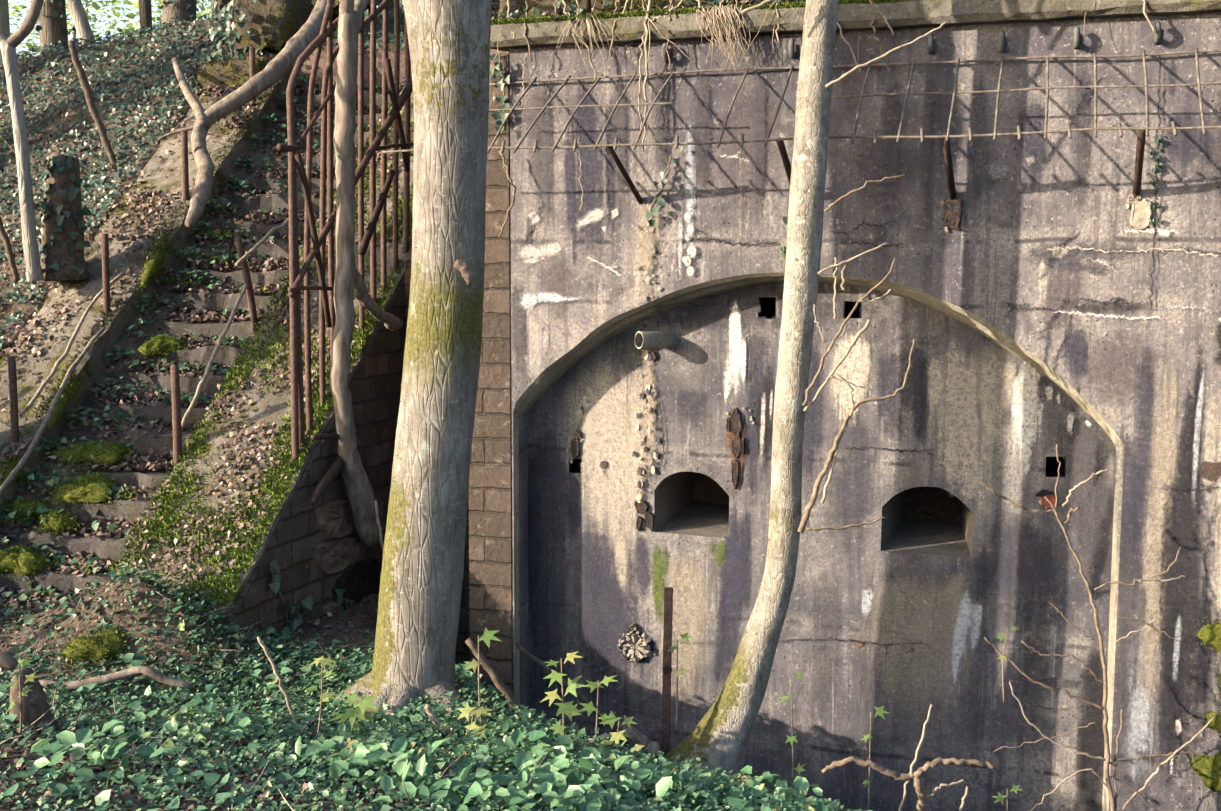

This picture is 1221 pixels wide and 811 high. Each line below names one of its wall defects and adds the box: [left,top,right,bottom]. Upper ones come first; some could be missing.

leakage [511,81,626,370]
leakage [652,71,668,172]
leakage [678,73,709,276]
leakage [724,83,775,214]
leakage [663,286,783,489]
leakage [527,360,750,709]
leakage [803,243,1221,811]